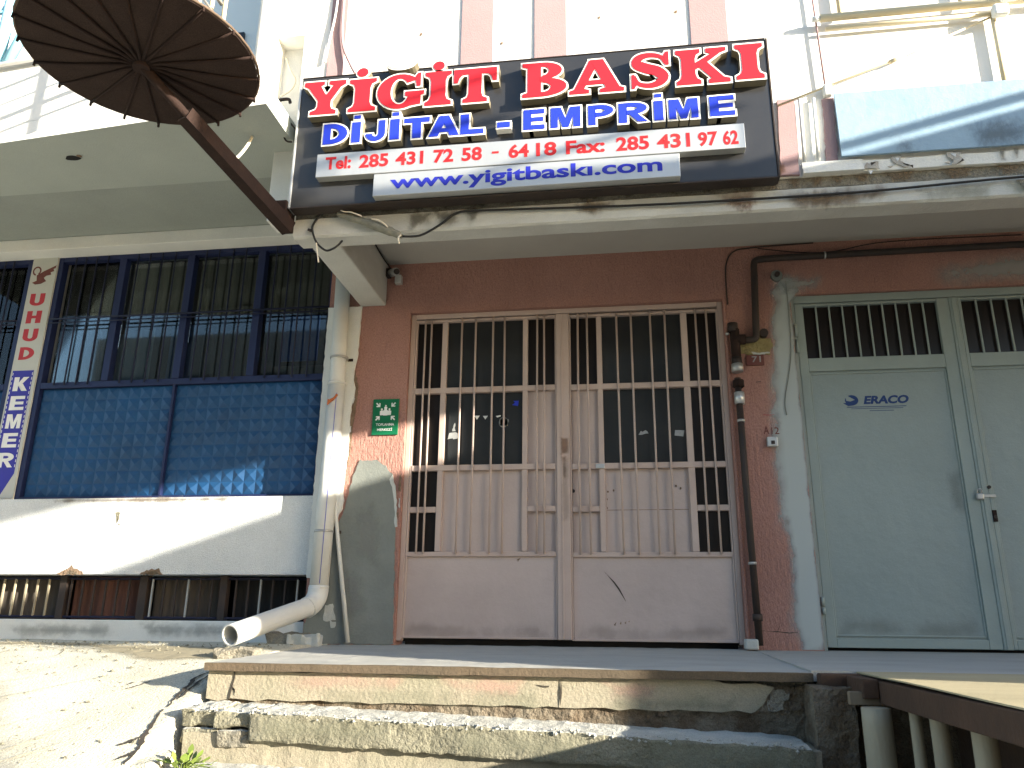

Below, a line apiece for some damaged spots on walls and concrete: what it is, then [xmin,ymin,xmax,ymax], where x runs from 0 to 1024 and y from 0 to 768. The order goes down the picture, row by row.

damp [998,149,1018,172]
damp [945,168,967,177]
damp [792,177,878,205]
spalling [57,565,83,575]
crack [115,671,235,765]